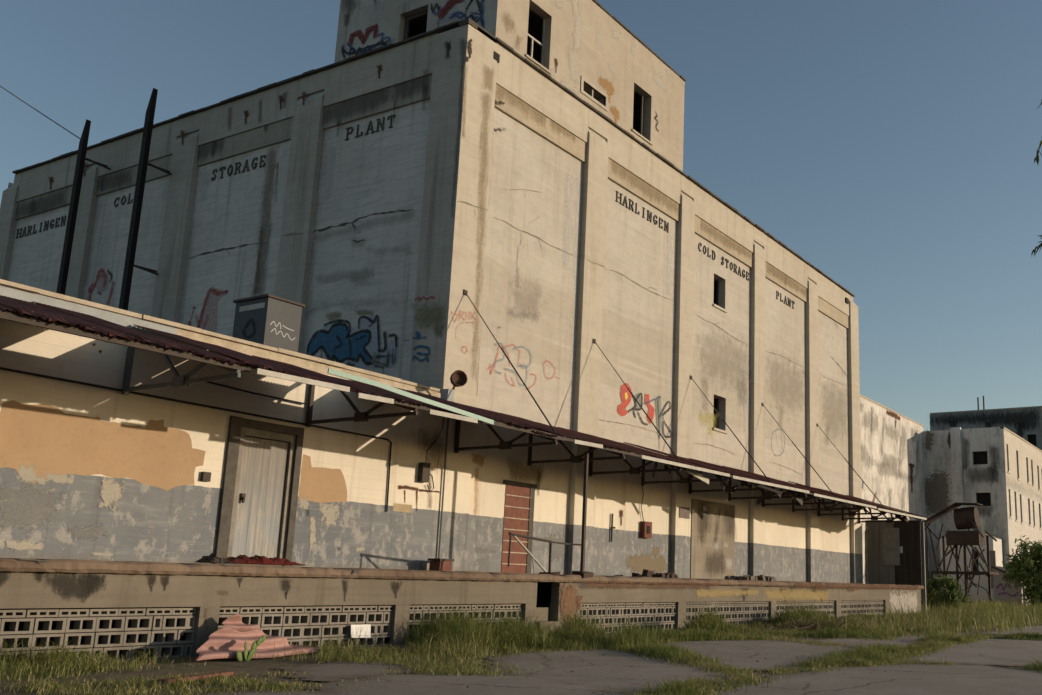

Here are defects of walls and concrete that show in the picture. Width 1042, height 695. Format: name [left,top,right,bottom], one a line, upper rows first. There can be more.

corrosion [600,79,619,123]
crack [189,209,414,259]
crack [457,189,673,301]
peeling [18,464,75,493]
peeling [99,477,126,513]
peeling [0,539,44,552]
peeling [298,496,340,554]